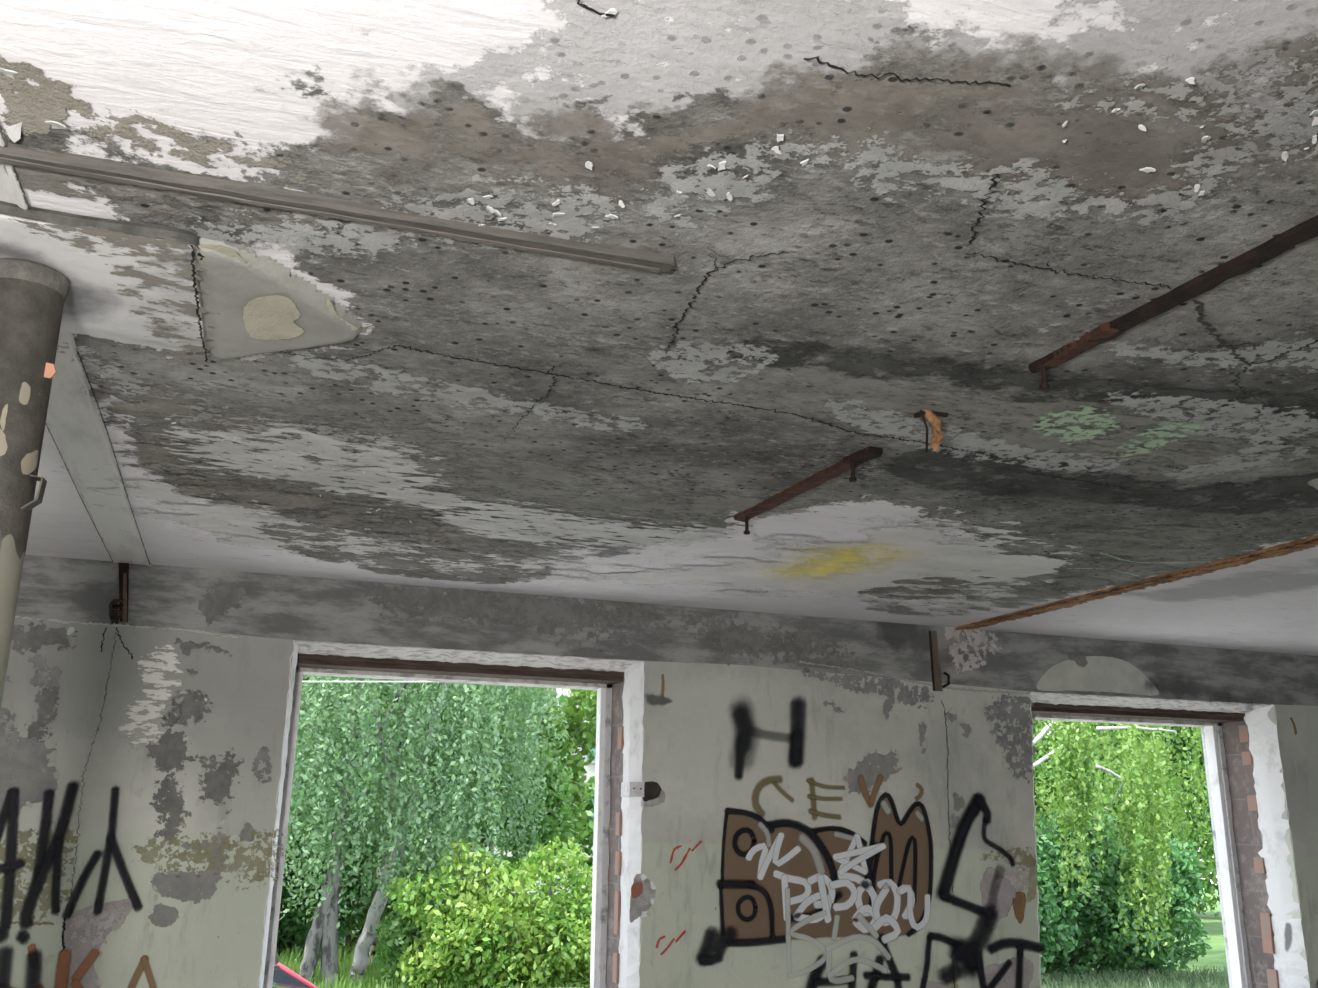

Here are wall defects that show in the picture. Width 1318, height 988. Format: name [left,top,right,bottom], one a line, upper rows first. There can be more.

crack [577,0,614,17]
peeling [0,57,324,183]
peeling [8,214,219,362]
water stain [4,25,1318,602]
crack [280,345,1164,497]
crack [665,244,789,354]
rust [1044,322,1119,368]
crack [966,174,1318,407]
peeling [85,377,934,754]
rust [967,540,1318,629]
peeling [131,638,284,927]
flaking render [0,829,133,988]